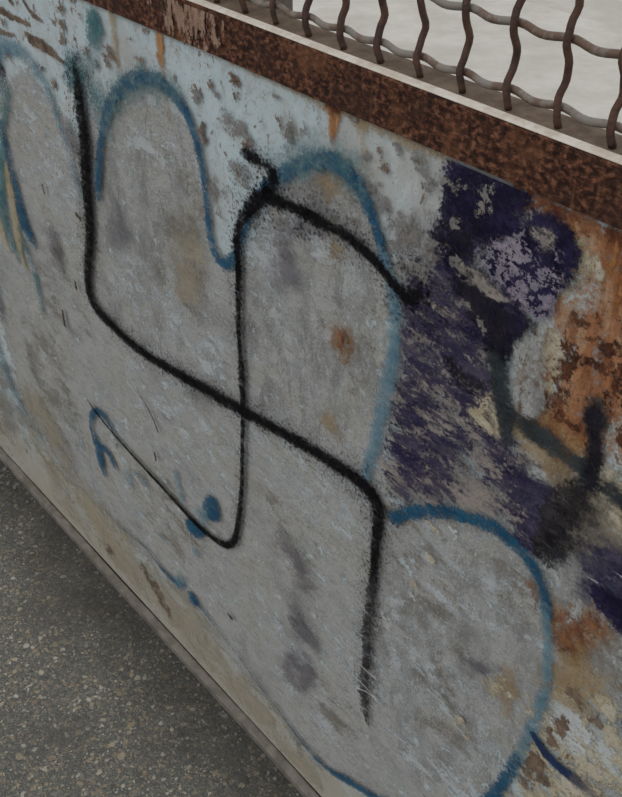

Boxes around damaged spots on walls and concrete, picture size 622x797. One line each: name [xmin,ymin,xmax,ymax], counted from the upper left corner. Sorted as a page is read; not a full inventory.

corrosion [0,0,66,66]
corrosion [154,31,165,70]
corrosion [281,85,450,158]
corrosion [513,184,622,489]
corrosion [547,594,616,667]